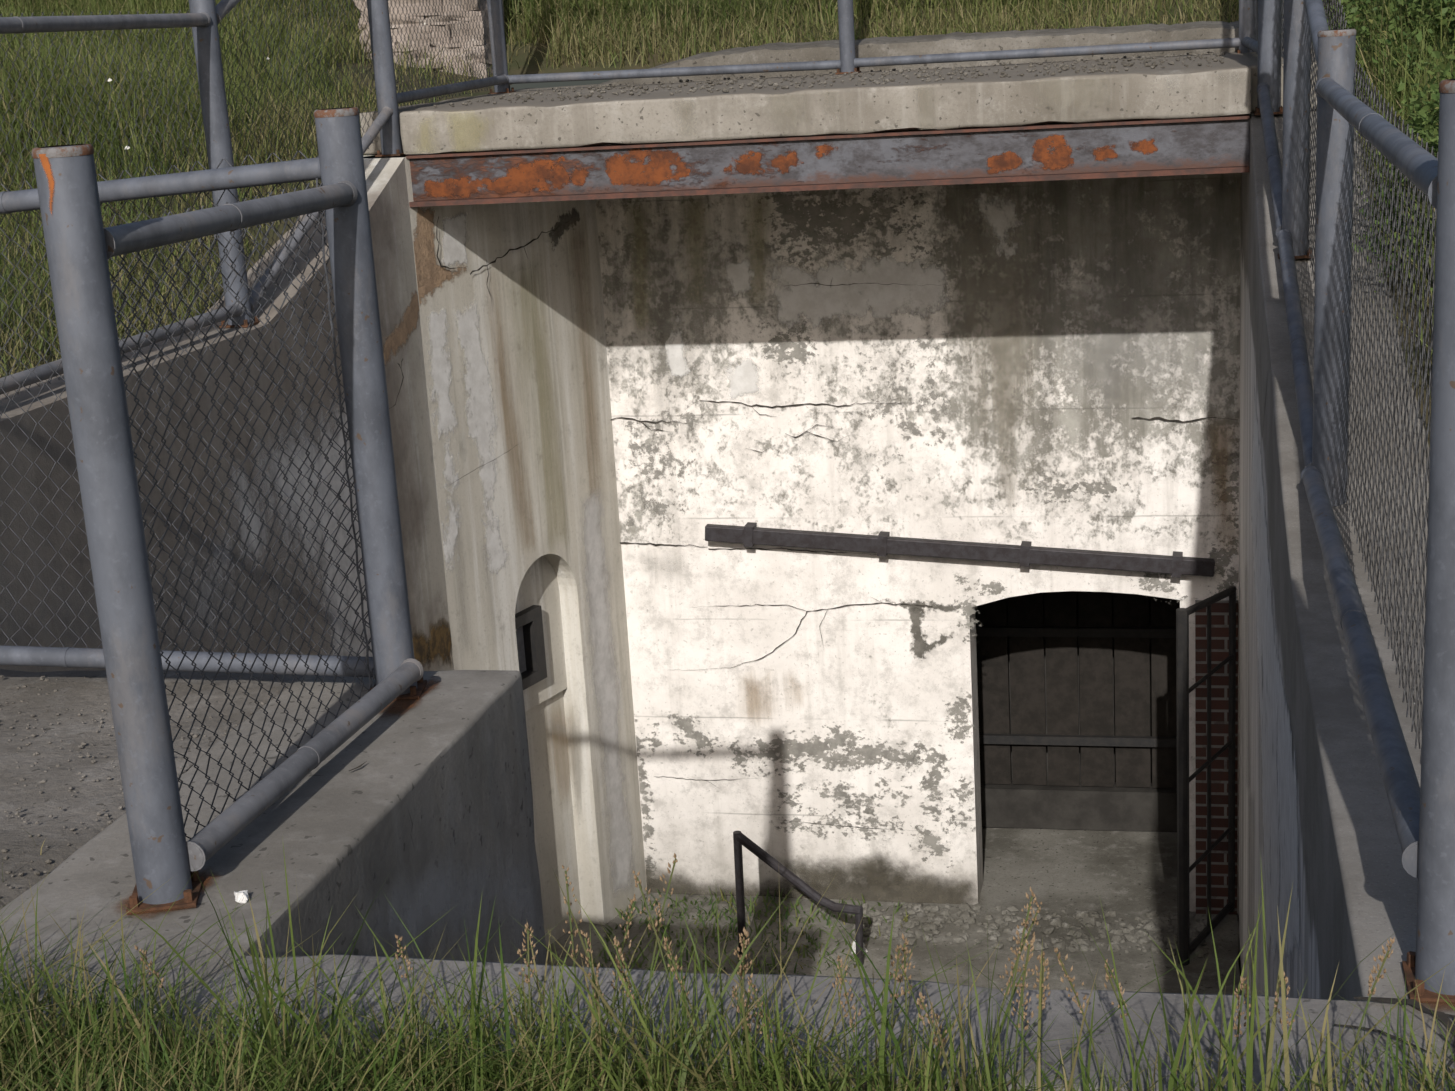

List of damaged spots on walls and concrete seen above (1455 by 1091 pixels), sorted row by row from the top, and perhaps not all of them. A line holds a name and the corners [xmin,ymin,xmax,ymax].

rust [424,147,691,198]
rust [724,144,838,175]
rust [987,134,1074,174]
rust [1093,138,1158,161]
peeling [758,188,946,269]
crack [436,216,572,305]
peeling [665,316,690,376]
peeling [758,319,817,373]
crack [611,400,903,452]
peeling [860,332,954,479]
crack [676,598,933,671]
peeling [634,693,976,876]